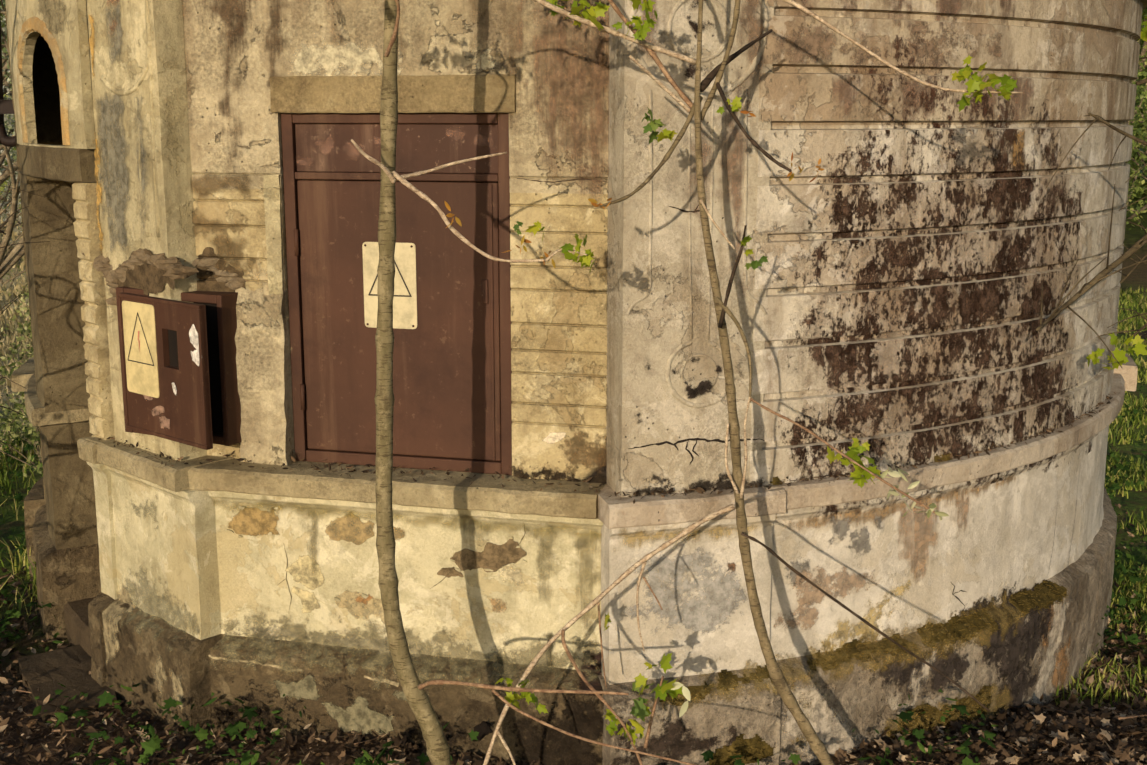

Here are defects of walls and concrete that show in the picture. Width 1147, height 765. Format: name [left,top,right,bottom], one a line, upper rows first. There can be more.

leakage [266,0,283,87]
leakage [98,94,145,250]
spalling [117,249,175,296]
spalling [196,247,246,292]
leakage [777,21,1104,482]
crack [628,438,764,465]
peeling [227,506,279,538]
peeling [325,512,374,545]
spalling [437,536,527,578]
leakage [774,561,877,629]
leakage [867,583,1068,721]
leakage [783,686,860,762]